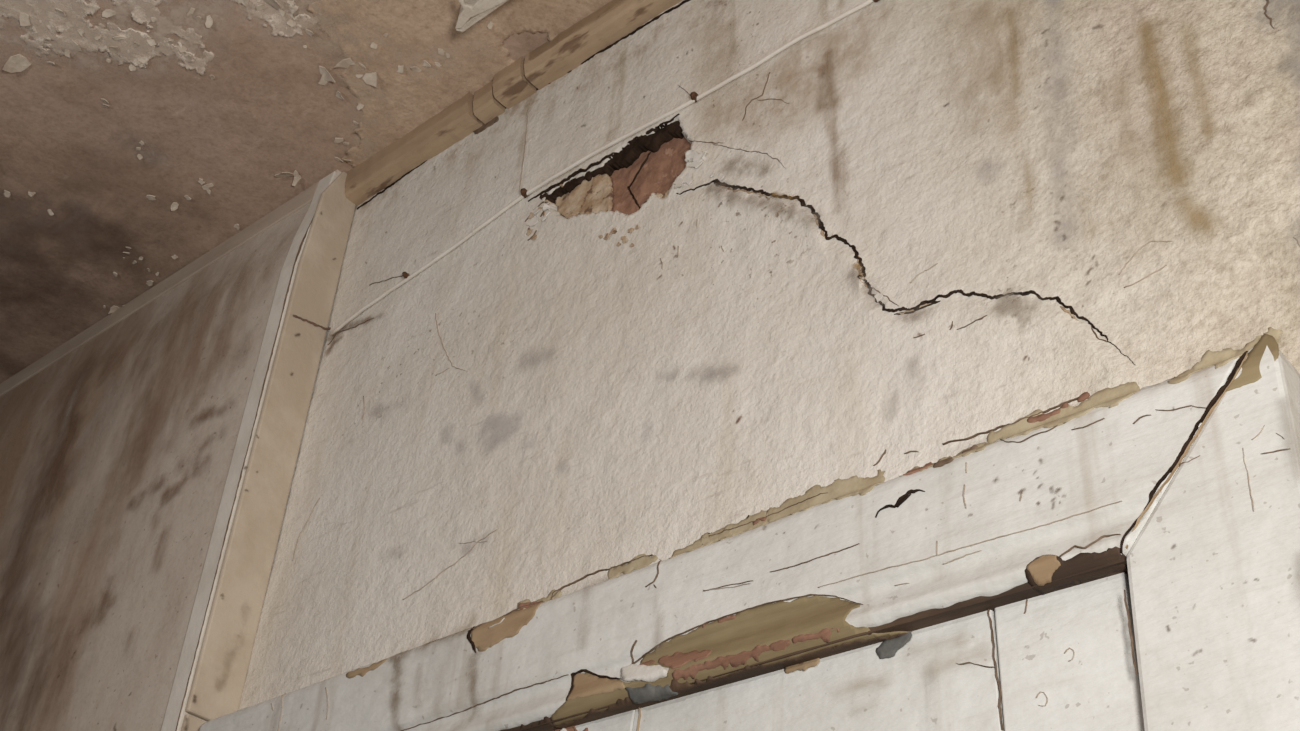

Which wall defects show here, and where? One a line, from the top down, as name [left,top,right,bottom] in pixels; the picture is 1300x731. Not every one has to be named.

peeling [0,0,612,168]
peeling [113,247,159,286]
peeling [171,178,214,211]
spalling [525,113,707,247]
crack [676,72,1135,365]
peeling [1167,327,1283,392]
peeling [458,382,1140,653]
peeling [346,652,403,678]
peeling [551,594,912,731]